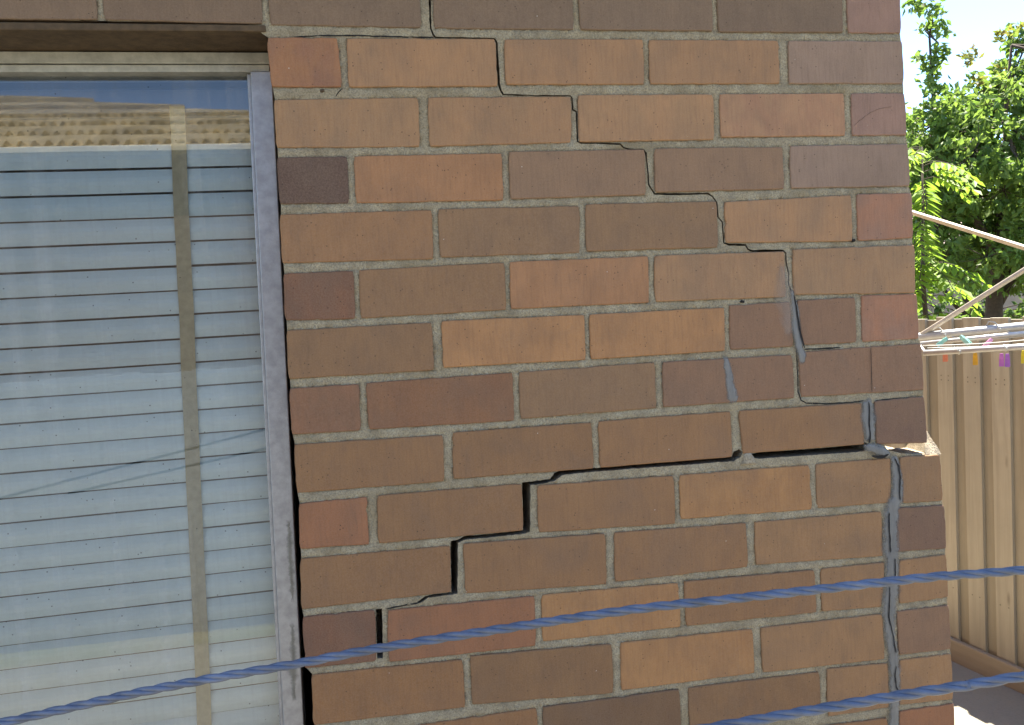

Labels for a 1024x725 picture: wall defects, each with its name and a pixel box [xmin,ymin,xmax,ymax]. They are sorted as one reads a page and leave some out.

crack [297,0,906,690]